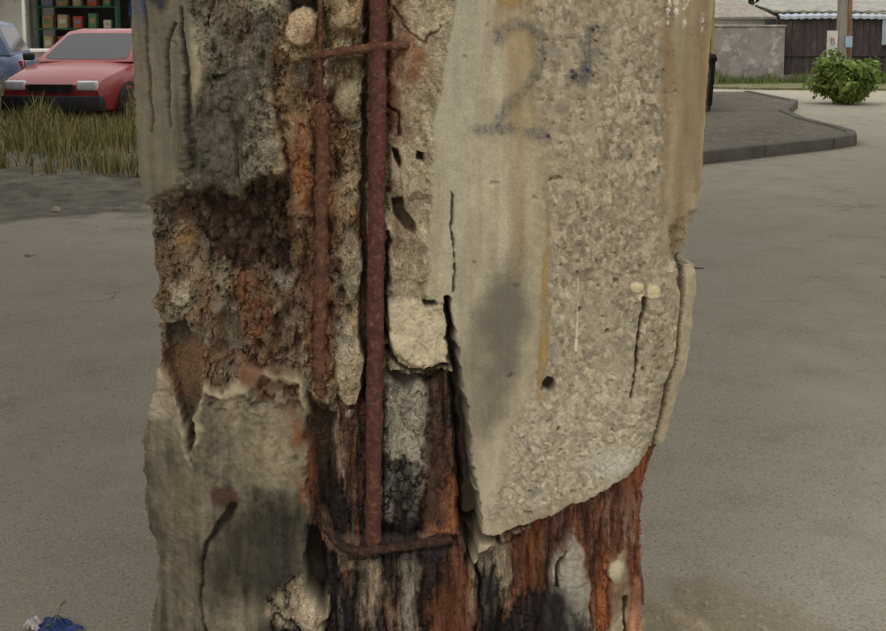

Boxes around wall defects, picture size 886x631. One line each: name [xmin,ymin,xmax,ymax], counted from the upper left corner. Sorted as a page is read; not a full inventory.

crack [386,103,403,137]
corrosion [387,0,412,131]
spalling [143,0,697,631]
crack [384,192,546,610]
crack [629,296,648,399]
crack [647,253,688,449]
crack [200,502,238,631]
crack [554,551,567,588]
corrosion [566,449,650,563]
corrosion [590,549,629,631]